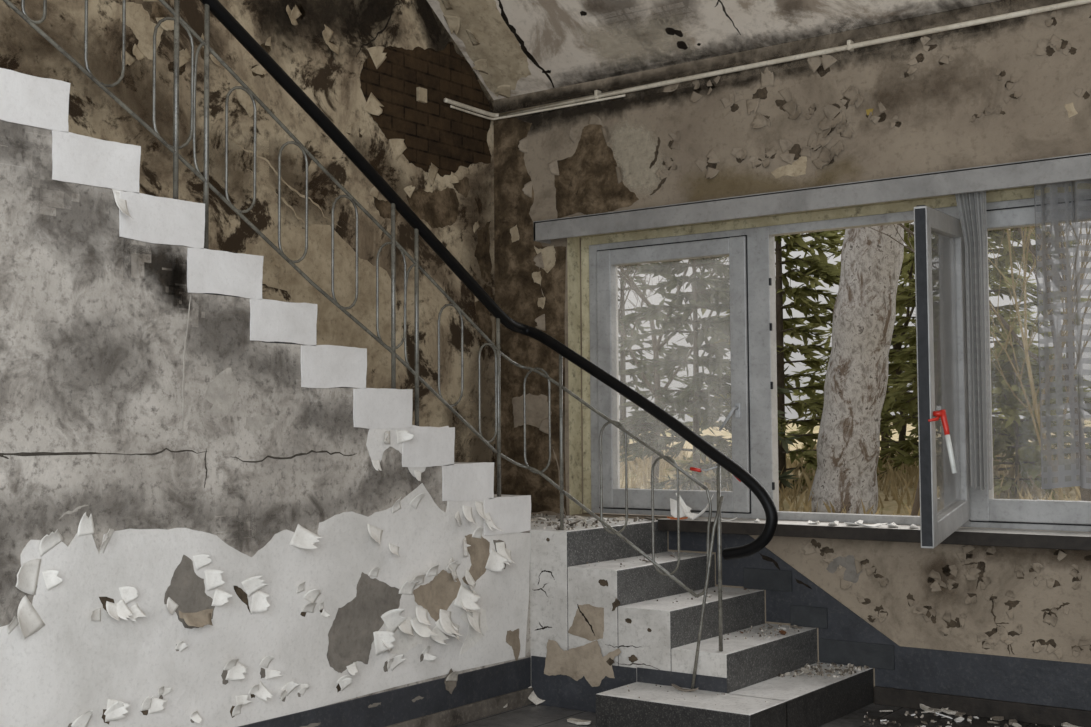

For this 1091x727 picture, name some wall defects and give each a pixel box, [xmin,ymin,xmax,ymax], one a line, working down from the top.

crack [498,0,555,88]
water stain [415,0,1024,113]
peeling [548,114,639,218]
peeling [689,67,901,169]
water stain [123,244,188,311]
peeling [356,0,565,515]
crack [0,296,207,488]
crack [234,450,357,463]
peeling [0,467,530,727]
peeling [544,598,638,687]
peeling [906,545,1022,650]
peeling [528,686,545,705]